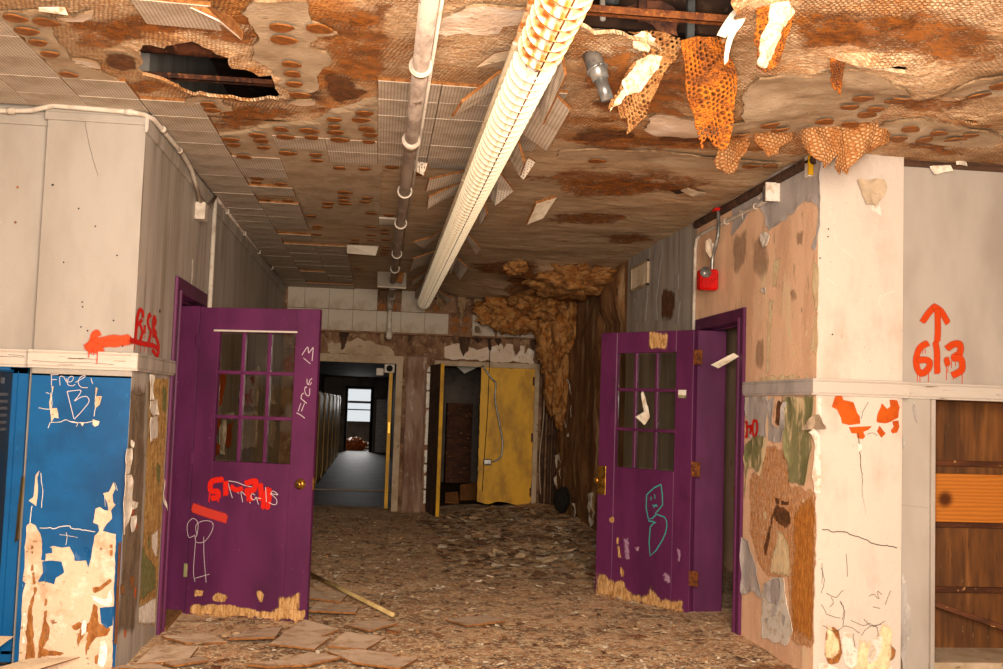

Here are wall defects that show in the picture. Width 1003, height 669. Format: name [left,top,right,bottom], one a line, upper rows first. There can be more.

peeling [733,396,787,497]
peeling [802,396,907,493]
peeling [15,374,169,669]
peeling [572,492,595,527]
crack [821,403,897,647]
flaking render [740,537,793,646]
flaking render [818,572,911,669]